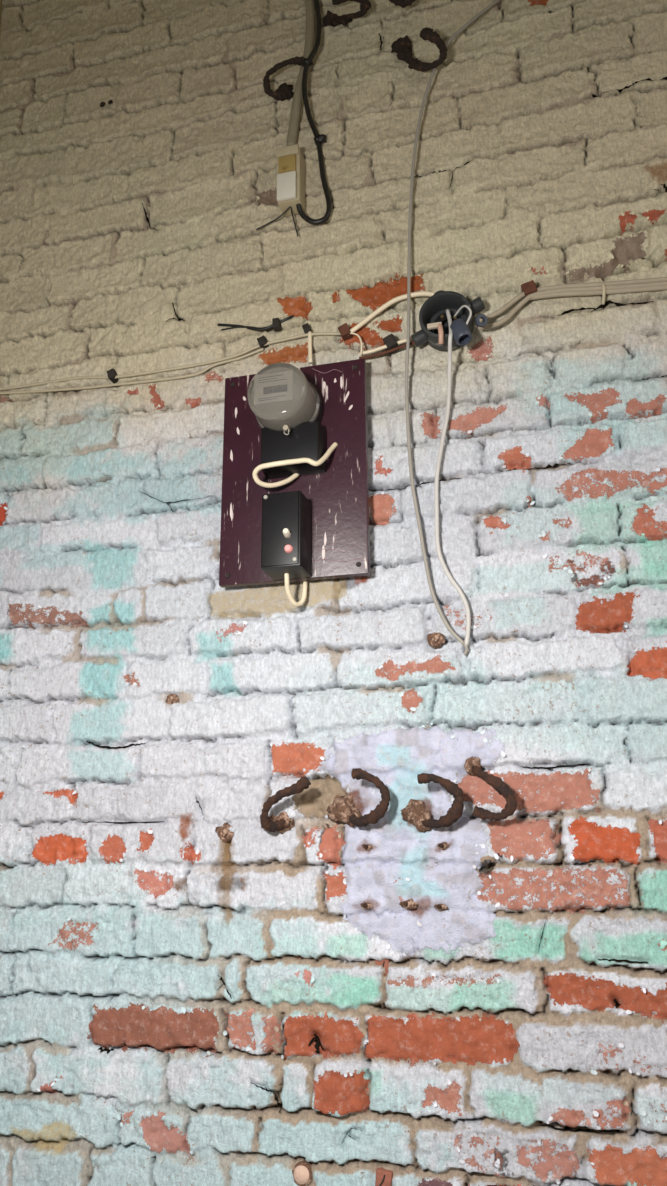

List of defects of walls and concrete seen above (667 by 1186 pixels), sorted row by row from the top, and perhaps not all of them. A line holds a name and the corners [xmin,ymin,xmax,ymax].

spalling [566,209,666,282]
peeling [420,404,507,439]
peeling [497,446,532,473]
peeling [555,387,667,541]
peeling [537,516,640,634]
peeling [626,641,667,681]
peeling [32,829,154,866]
peeling [134,868,174,899]
peeling [543,972,667,1024]
peeling [86,1002,520,1116]
peeling [117,1109,195,1160]
peeling [418,1081,667,1186]